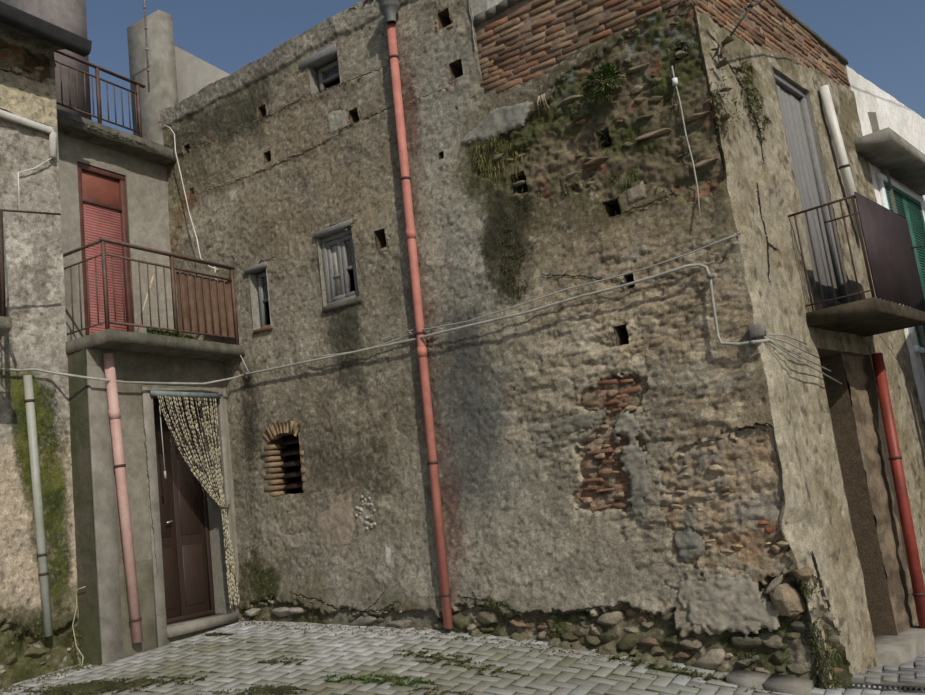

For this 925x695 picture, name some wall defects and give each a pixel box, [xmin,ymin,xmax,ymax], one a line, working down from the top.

spalling [0,38,56,83]
crack [186,65,390,151]
crack [191,84,456,197]
leakage [468,175,533,296]
flaking render [573,374,648,513]
crack [737,422,773,433]
spalling [241,428,853,690]
crack [290,591,405,615]
crack [457,591,621,616]